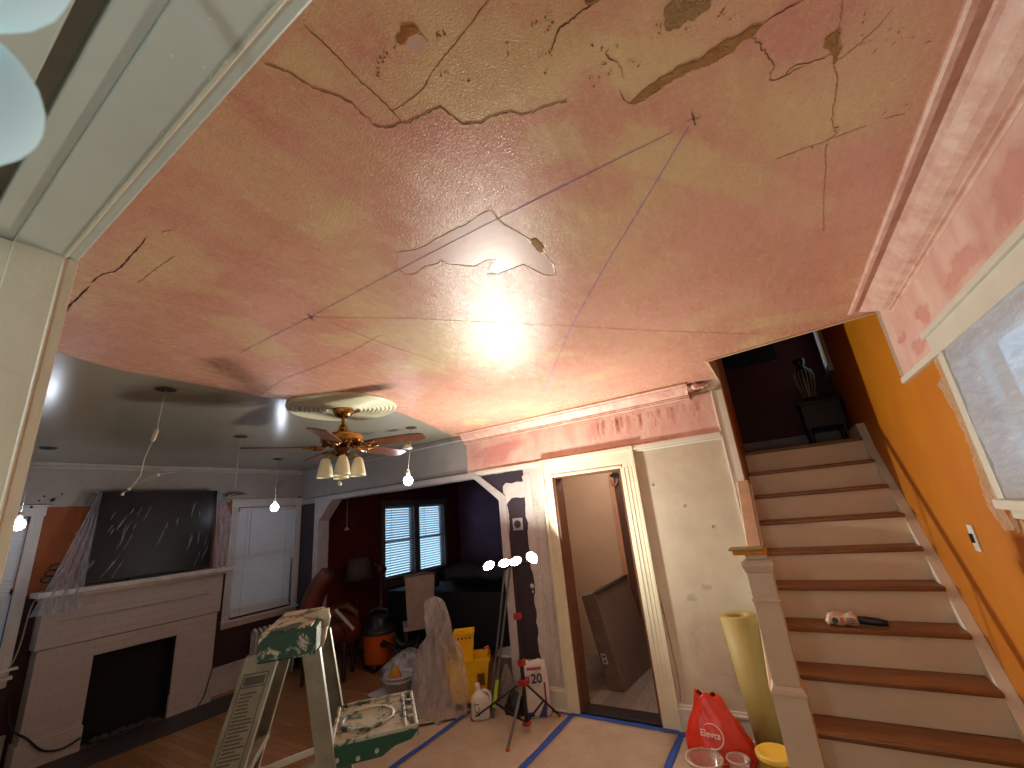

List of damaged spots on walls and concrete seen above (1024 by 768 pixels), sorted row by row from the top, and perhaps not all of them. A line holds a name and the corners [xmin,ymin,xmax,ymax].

peeling [373,25,446,80]
crack [264,1,567,129]
crack [531,0,599,75]
crack [589,47,641,104]
peeling [653,0,735,39]
crack [760,0,803,27]
peeling [772,1,900,187]
crack [66,230,175,312]
peeling [395,210,556,276]